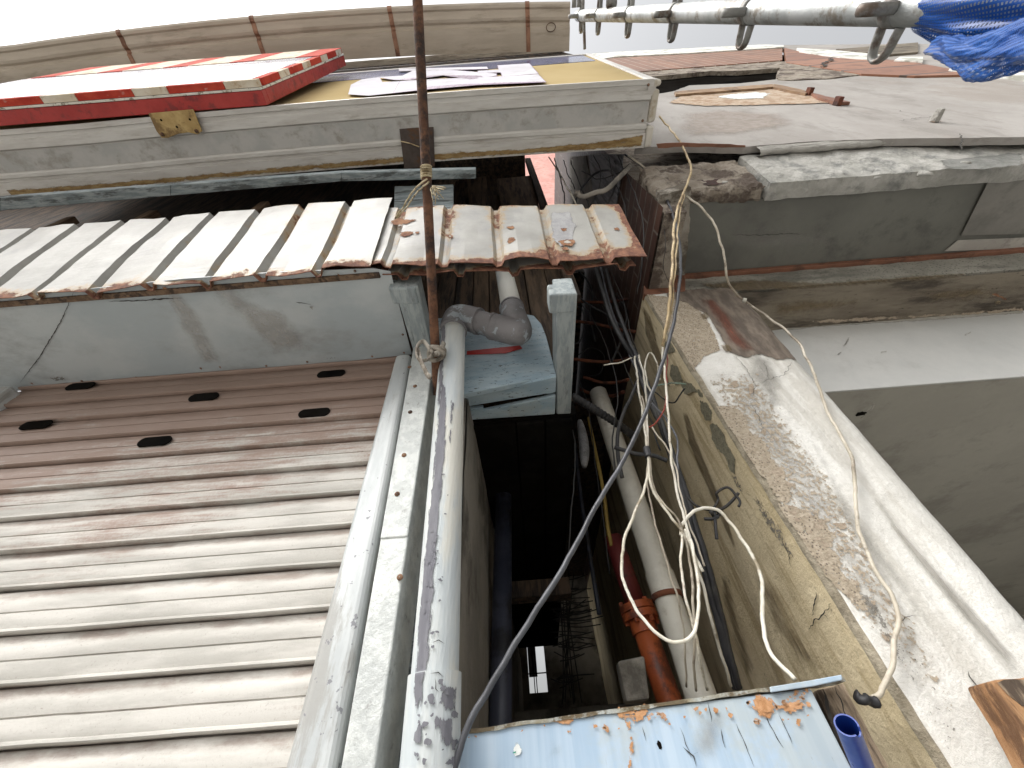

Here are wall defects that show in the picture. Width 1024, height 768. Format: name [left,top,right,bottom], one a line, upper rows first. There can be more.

rust [391,218,419,237]
rust [558,228,575,250]
crack [741,362,791,434]
peeling [647,294,952,710]
peeling [414,360,477,766]
crack [809,594,829,629]
peeling [593,704,671,768]
peeling [746,688,811,726]